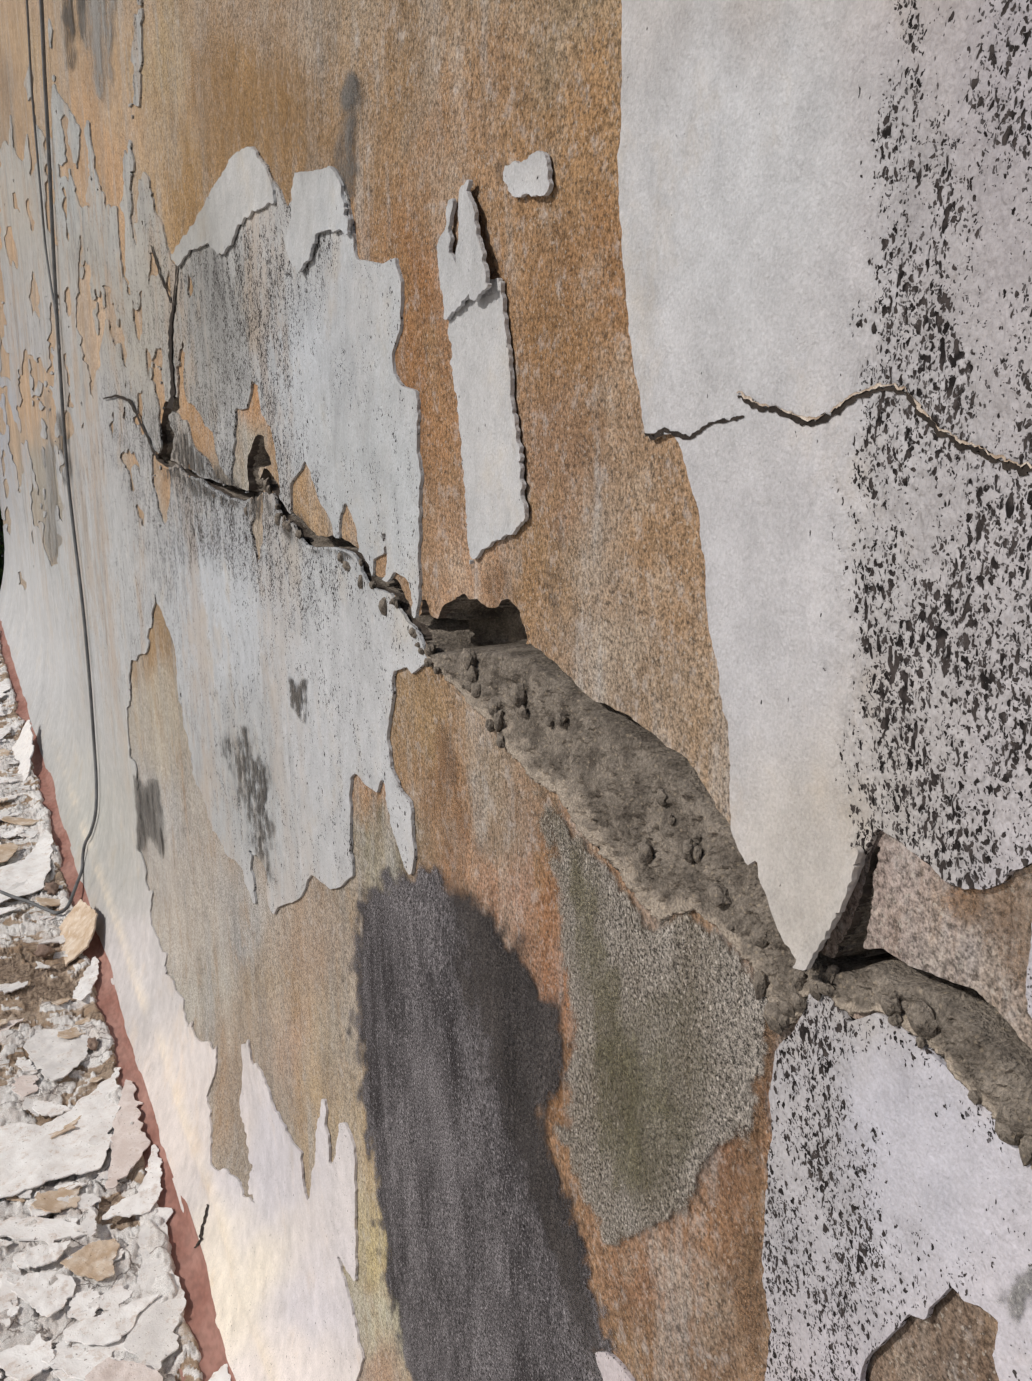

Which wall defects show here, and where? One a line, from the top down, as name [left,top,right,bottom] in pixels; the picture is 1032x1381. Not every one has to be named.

damp [61,0,115,98]
peeling [0,0,731,825]
peeling [128,602,801,1381]
damp [346,808,768,1381]
crack [103,245,1032,1169]
peeling [793,830,1032,1050]
peeling [865,1288,999,1381]